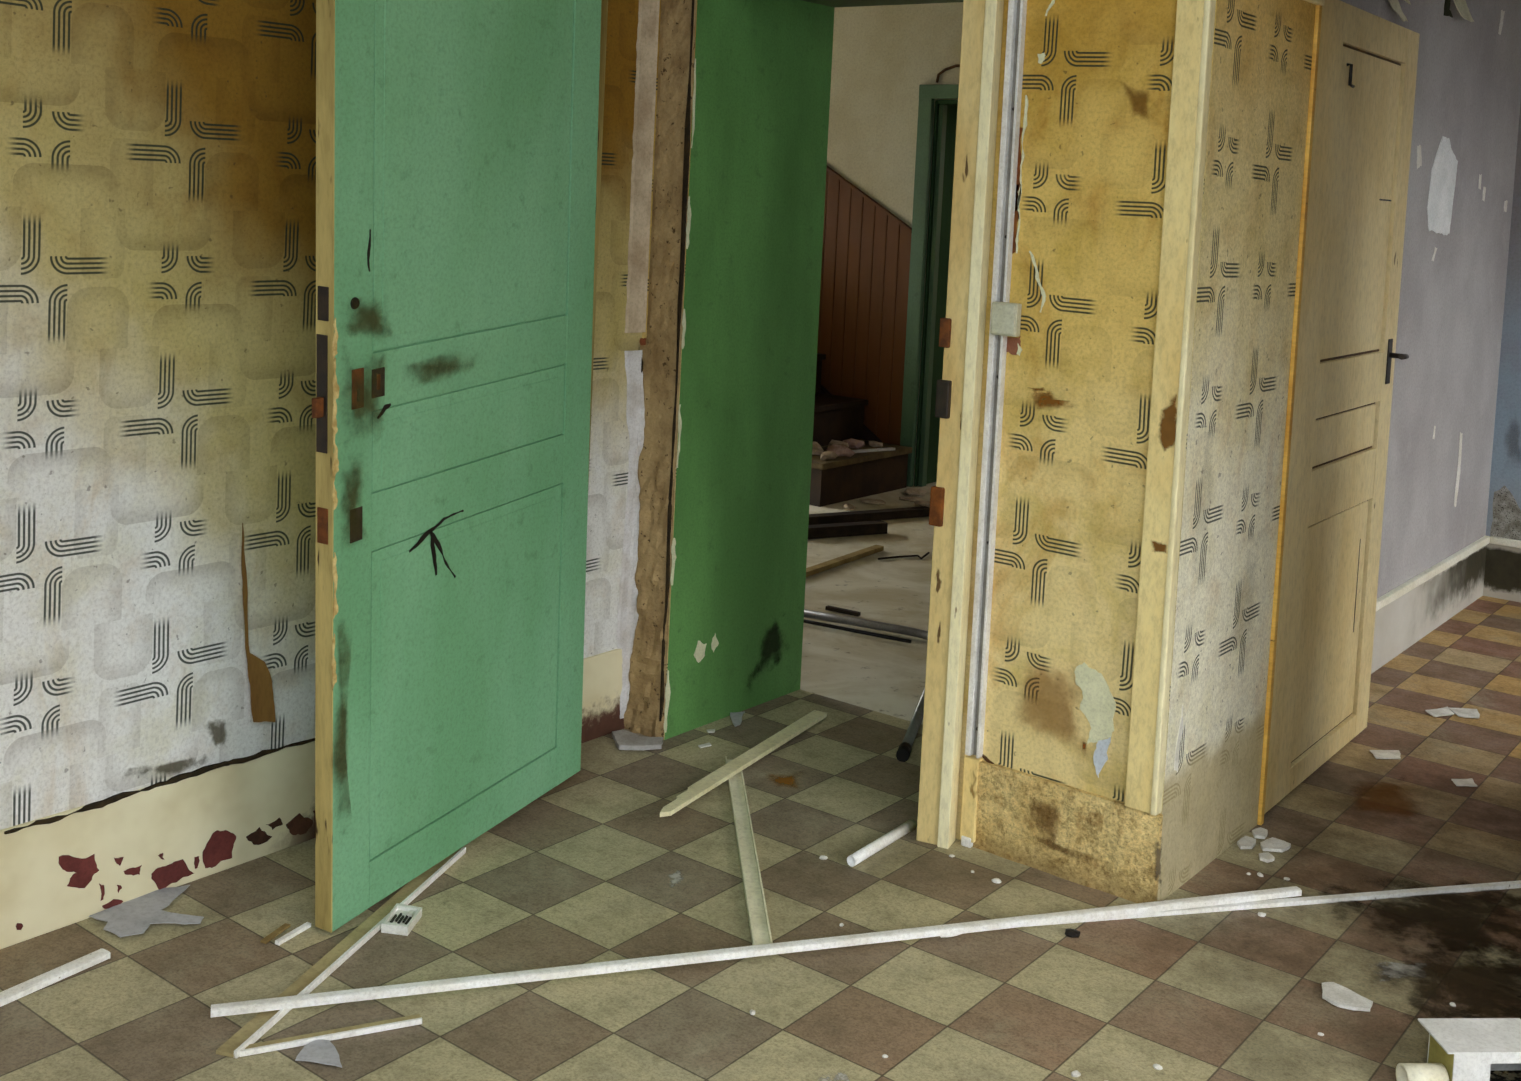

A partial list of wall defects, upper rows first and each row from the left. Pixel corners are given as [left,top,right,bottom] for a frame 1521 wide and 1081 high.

peeling [1444,0,1474,22]
peeling [1417,136,1458,261]
peeling [1454,432,1463,507]
peeling [241,523,275,722]
peeling [1074,662,1116,778]
peeling [59,810,315,909]